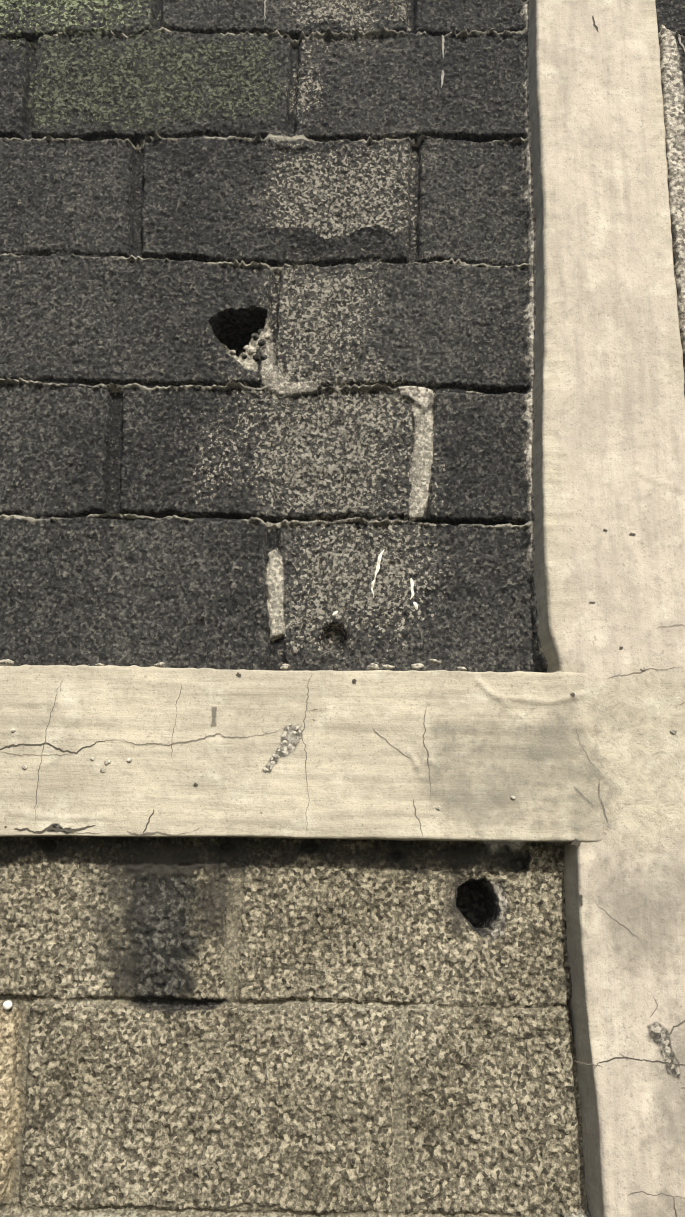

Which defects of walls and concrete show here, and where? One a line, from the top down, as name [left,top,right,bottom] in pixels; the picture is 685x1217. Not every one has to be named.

crack [0,675,317,830]
crack [127,809,199,836]
leakage [0,836,530,1013]
crack [575,998,685,1088]
crack [628,1191,682,1217]